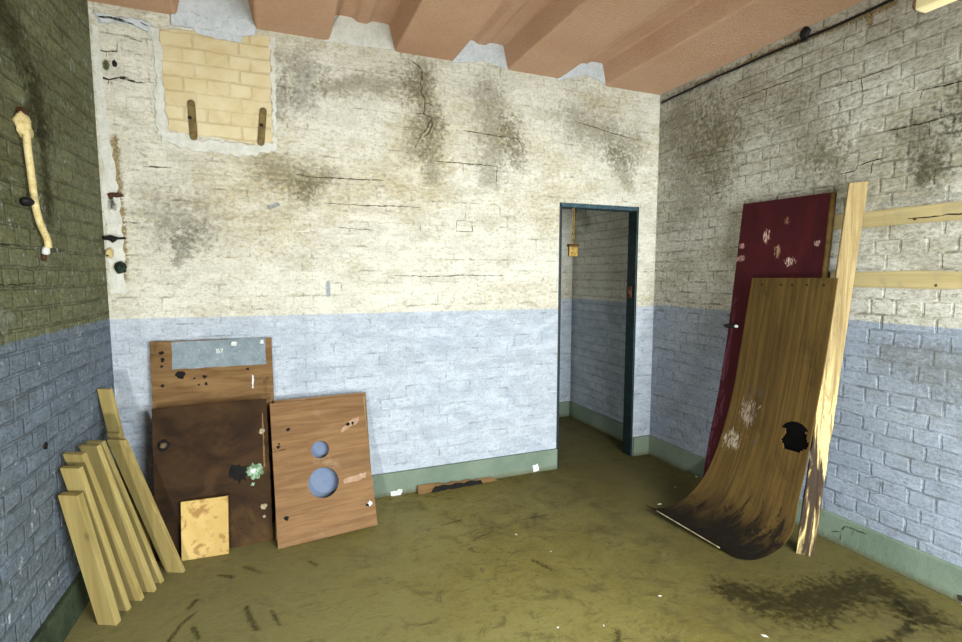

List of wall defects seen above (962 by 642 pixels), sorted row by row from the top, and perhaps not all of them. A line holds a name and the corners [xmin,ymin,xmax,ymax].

water stain [0,0,52,215]
peeling [148,25,277,157]
crack [889,113,953,135]
water stain [714,575,954,642]